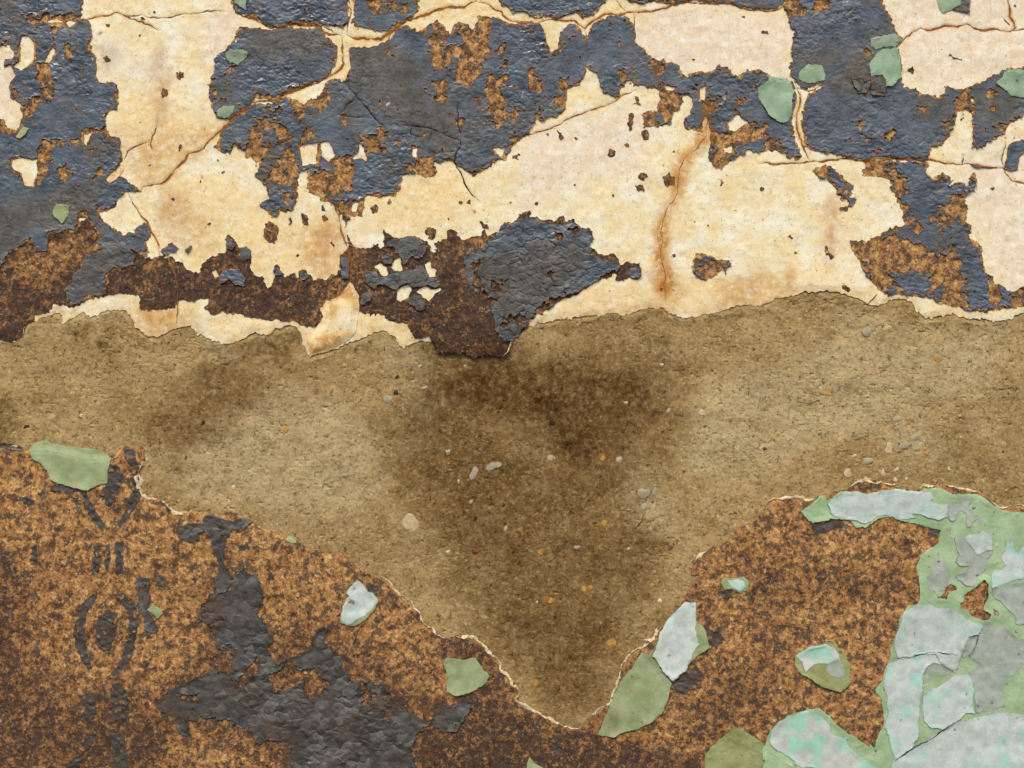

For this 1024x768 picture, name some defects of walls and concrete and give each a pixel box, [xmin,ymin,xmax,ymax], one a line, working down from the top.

peeling [0,0,151,306]
corrosion [0,210,642,359]
crack [82,1,784,323]
peeling [207,0,1024,313]
crack [761,83,1024,188]
crack [898,0,1024,47]
spalling [0,213,1024,768]
corrosion [0,446,1024,768]